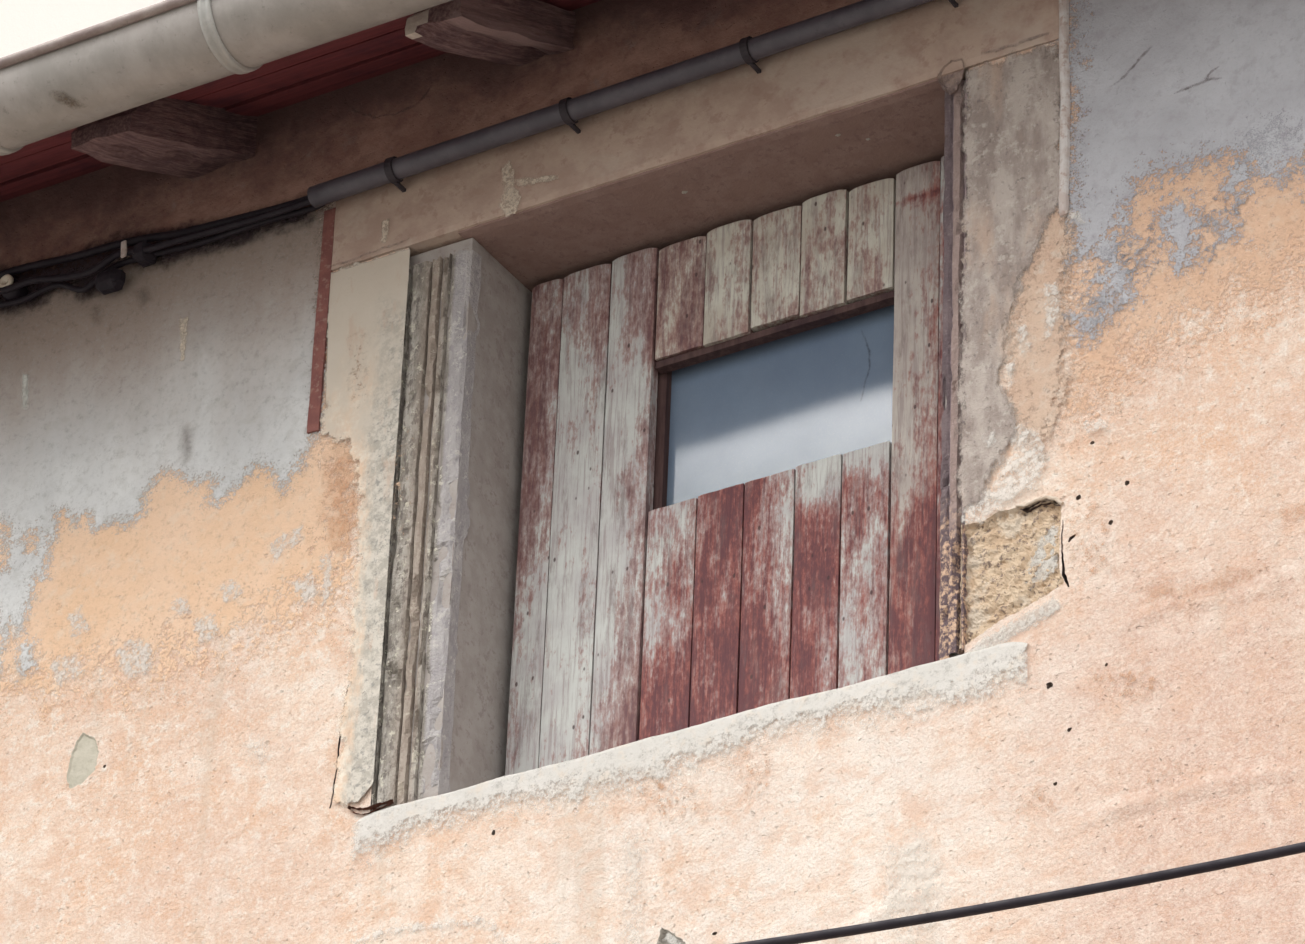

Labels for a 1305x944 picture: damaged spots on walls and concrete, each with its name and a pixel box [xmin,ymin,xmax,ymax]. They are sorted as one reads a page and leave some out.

peeling [0,205,365,737]
peeling [959,0,1305,652]
spalling [67,733,106,789]
spalling [657,927,686,944]